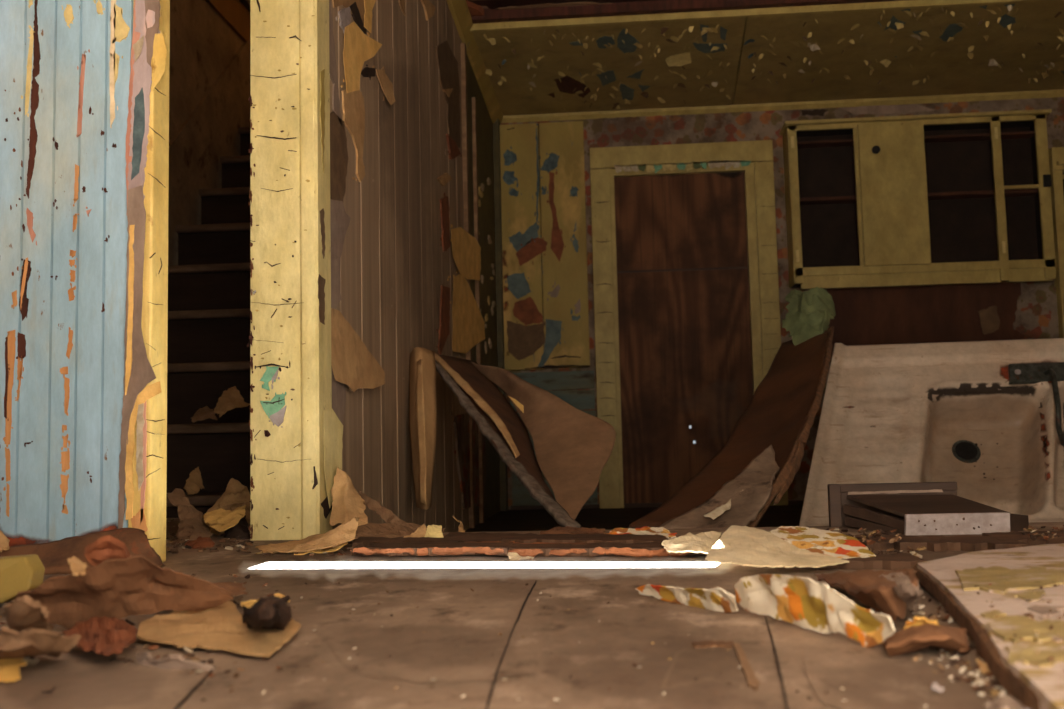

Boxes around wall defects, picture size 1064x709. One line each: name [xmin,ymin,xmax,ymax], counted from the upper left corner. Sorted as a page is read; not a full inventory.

peeling [4,0,41,246]
peeling [76,49,94,138]
peeling [93,0,130,148]
peeling [151,31,167,93]
peeling [336,0,395,182]
peeling [0,257,31,517]
peeling [50,250,77,301]
peeling [60,327,73,514]
peeling [72,164,91,232]
spalling [247,310,295,441]
peeling [318,274,385,392]
peeling [437,123,581,367]